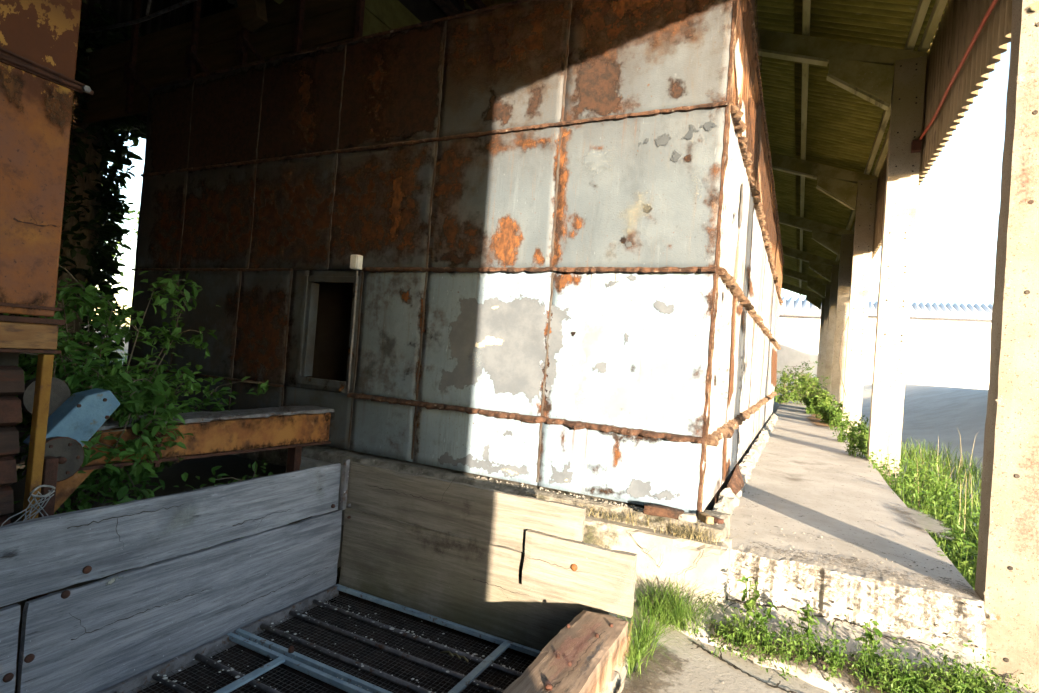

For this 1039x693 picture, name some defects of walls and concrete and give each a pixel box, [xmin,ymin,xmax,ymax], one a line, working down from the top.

corrosion [399,287,436,393]
peeling [439,294,576,405]
corrosion [728,246,755,406]
corrosion [690,415,711,437]
peeling [626,479,680,501]
crack [629,533,716,581]